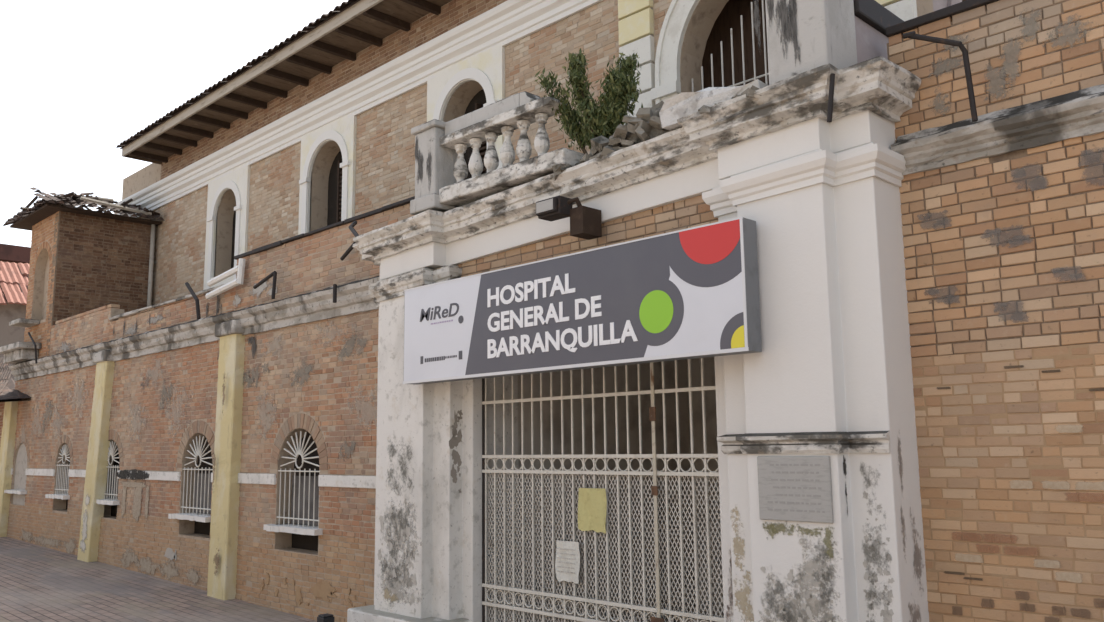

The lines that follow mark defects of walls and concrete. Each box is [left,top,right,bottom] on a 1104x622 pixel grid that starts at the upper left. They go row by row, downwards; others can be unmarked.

water stain [754,0,801,63]
spalling [625,108,666,144]
water stain [388,445,412,495]
water stain [381,510,412,602]
water stain [731,509,754,622]
water stain [766,580,802,622]
mould [863,537,889,608]